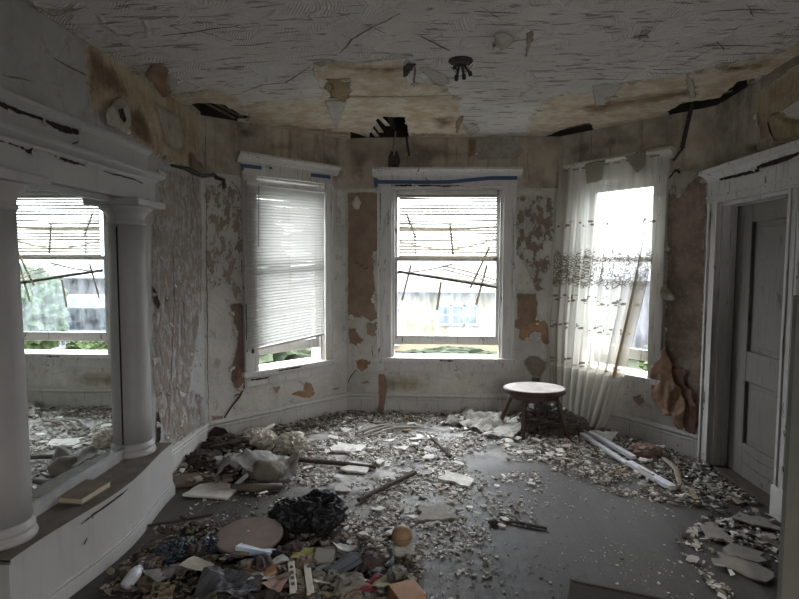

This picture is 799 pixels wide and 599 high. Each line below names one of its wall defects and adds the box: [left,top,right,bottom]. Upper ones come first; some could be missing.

leakage [324,78,353,104]
peeling [85,44,479,443]
peeling [514,195,554,346]